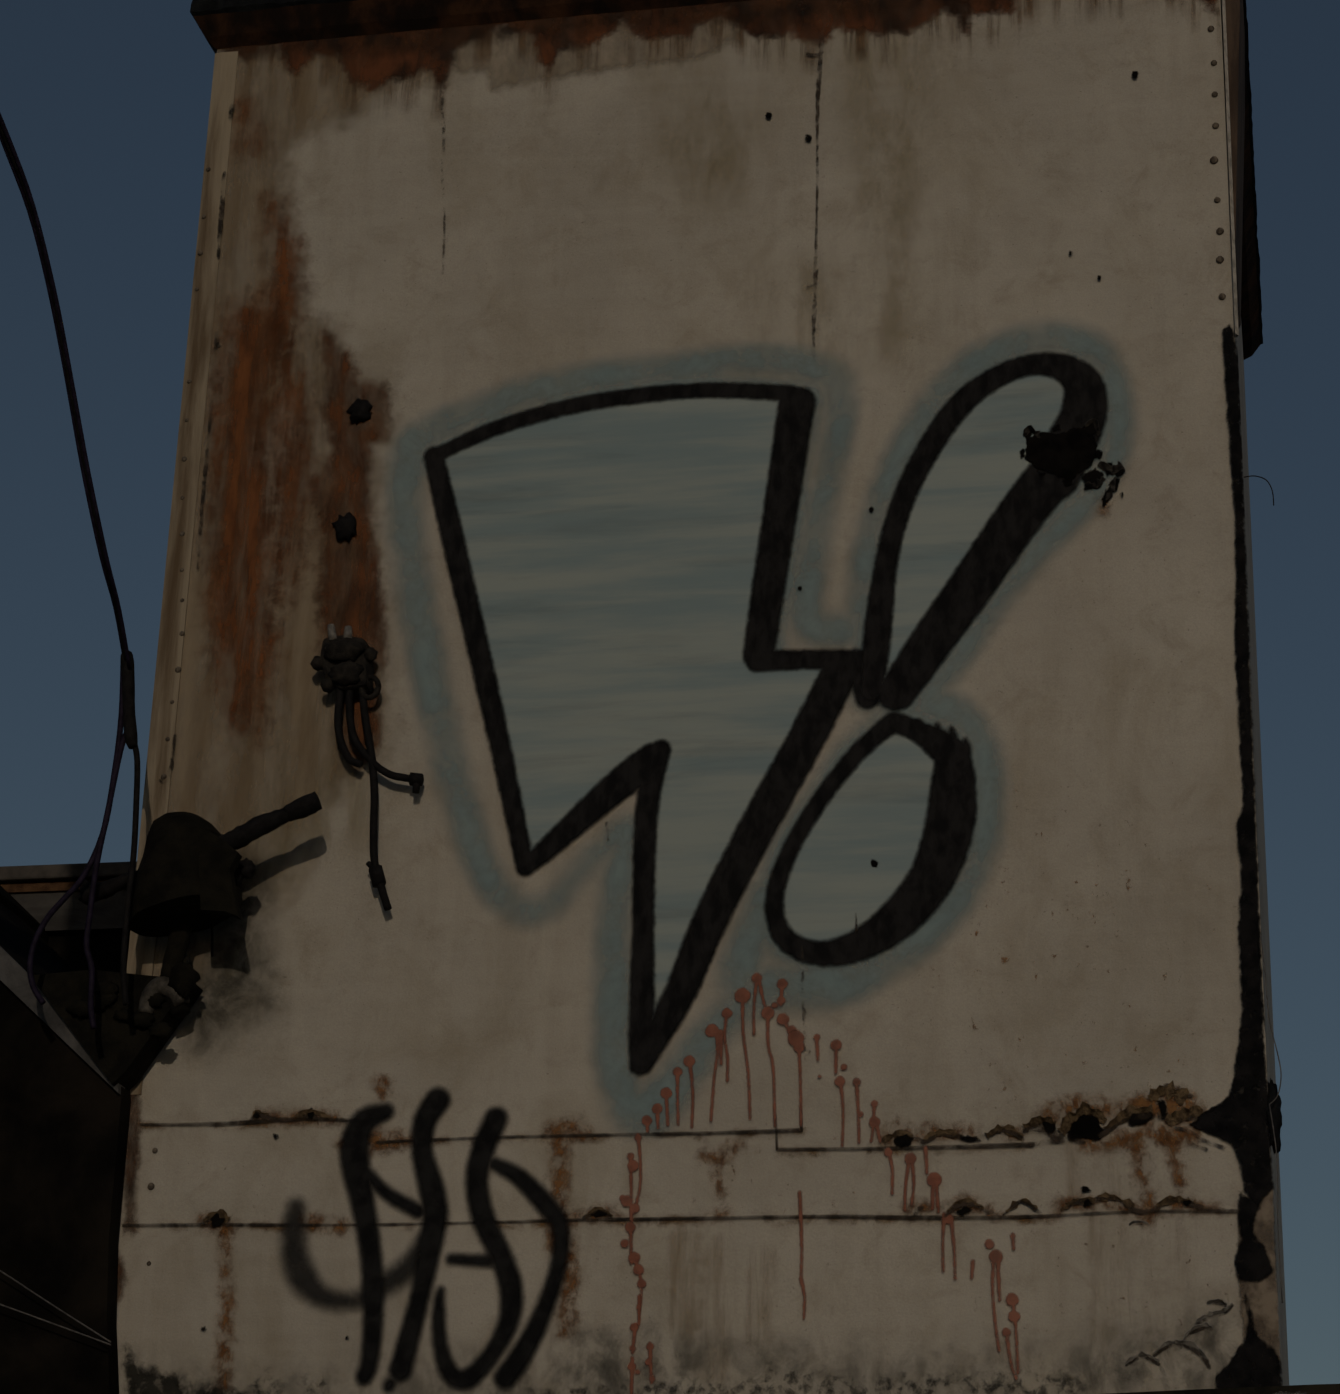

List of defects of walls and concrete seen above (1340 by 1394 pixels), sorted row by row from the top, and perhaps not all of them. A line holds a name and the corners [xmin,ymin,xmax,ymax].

rust [225,0,1032,100]
peeling [1023,425,1040,438]
peeling [1085,461,1125,503]
rust [312,335,388,762]
rust [545,1120,627,1225]
rust [1042,1095,1218,1224]
rust [198,1215,234,1391]
water stain [124,1354,260,1394]